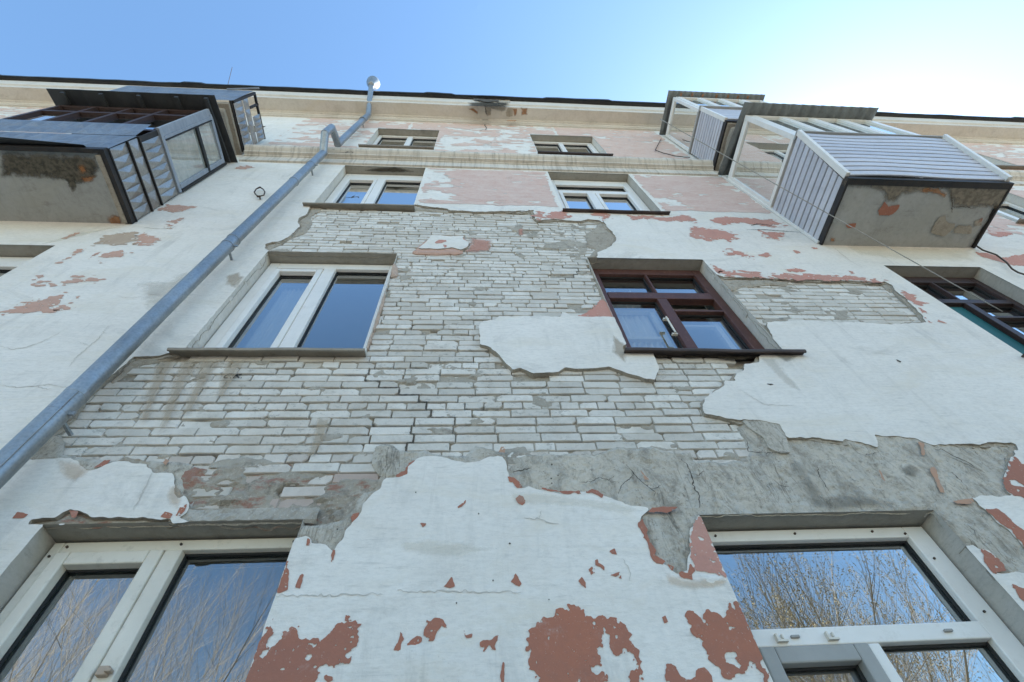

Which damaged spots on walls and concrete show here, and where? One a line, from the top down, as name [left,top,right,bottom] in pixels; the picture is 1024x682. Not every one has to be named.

peeling [268,98,689,159]
flaking render [711,265,945,349]
flaking render [0,168,848,531]
crack [584,468,660,496]
crack [681,459,704,508]
peeling [950,443,1024,498]
peeling [638,506,727,580]
peeling [986,508,1024,546]
peeling [245,615,361,682]
peeling [394,618,447,651]
peeling [525,599,644,682]
peeling [665,601,769,682]